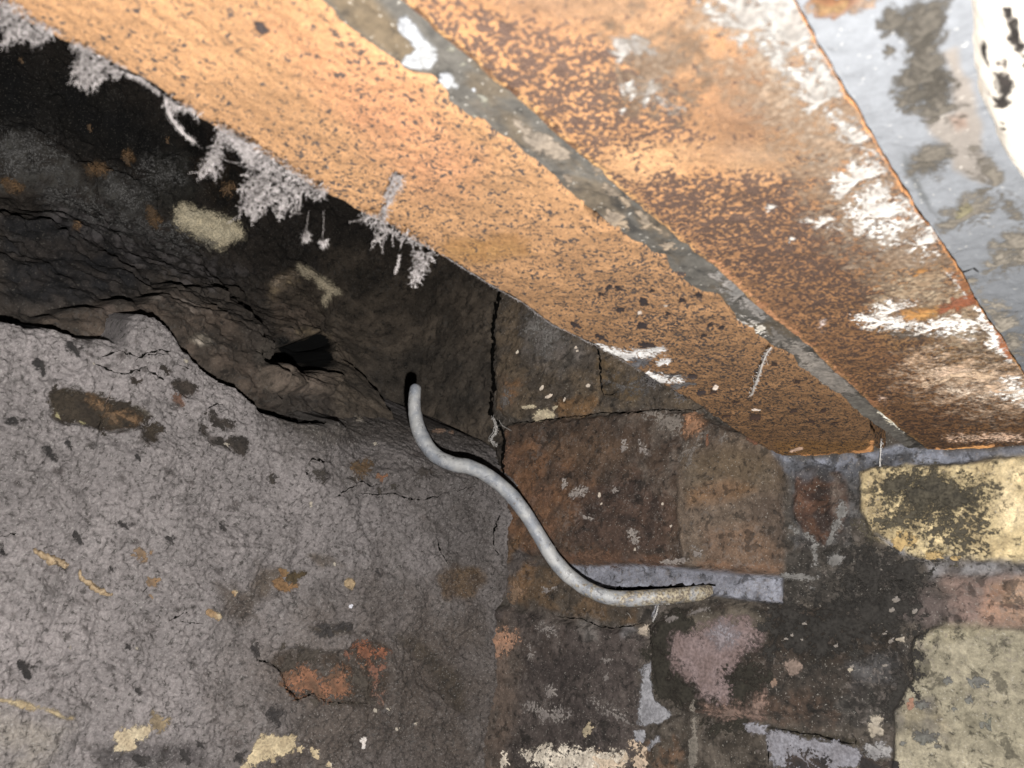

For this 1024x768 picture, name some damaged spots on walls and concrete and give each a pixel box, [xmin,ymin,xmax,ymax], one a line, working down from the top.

water stain [0,129,199,257]
water stain [596,0,1024,417]
crack [488,291,703,474]
efflorescence [947,431,1022,443]